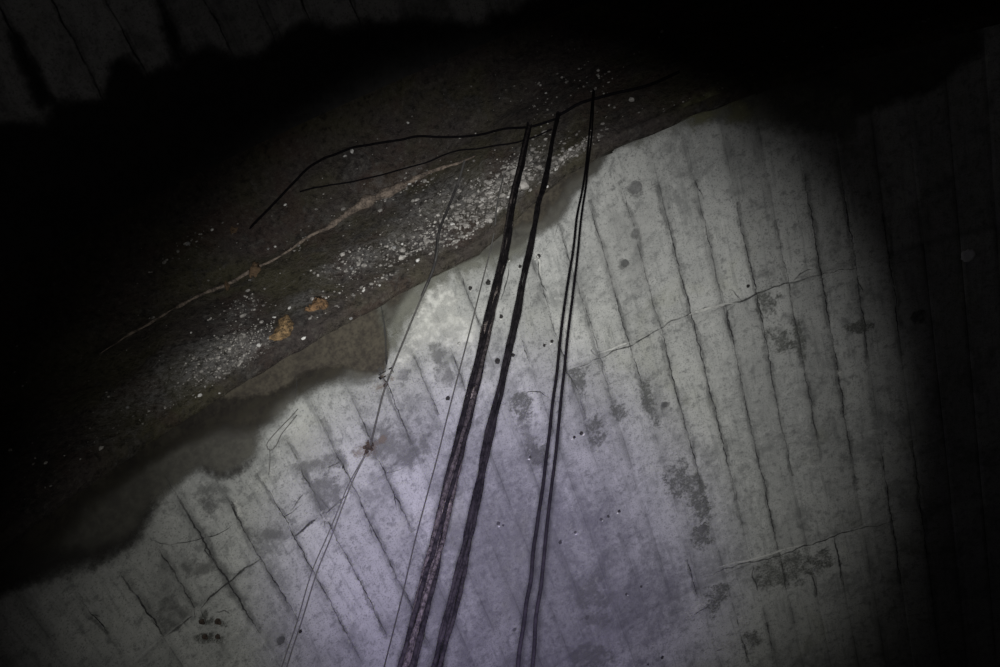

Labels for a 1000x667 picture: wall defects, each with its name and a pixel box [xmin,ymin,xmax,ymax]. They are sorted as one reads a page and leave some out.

leakage [0,0,595,277]
leakage [380,156,602,365]
crack [601,269,851,353]
leakage [0,366,343,592]
crack [153,561,257,631]
crack [295,498,344,536]
crack [707,523,885,590]